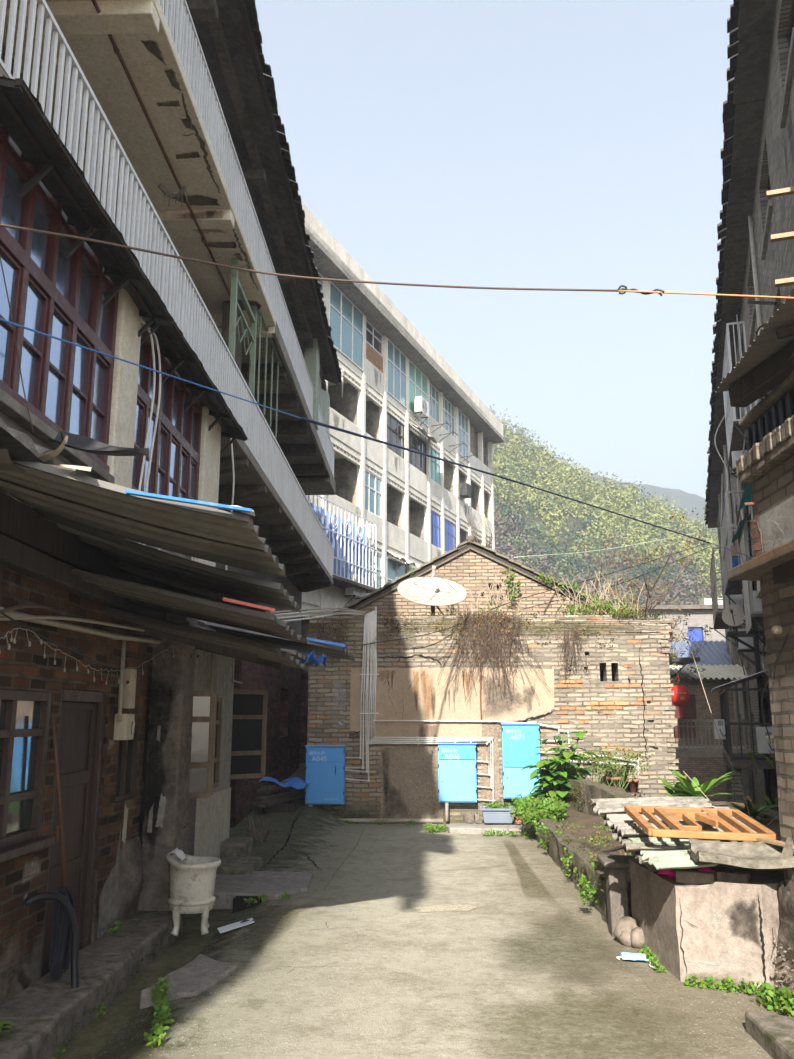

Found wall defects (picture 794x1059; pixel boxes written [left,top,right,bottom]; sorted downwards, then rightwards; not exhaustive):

spalling [140,40,221,206]
crack [639,641,649,770]
crack [758,895,782,987]